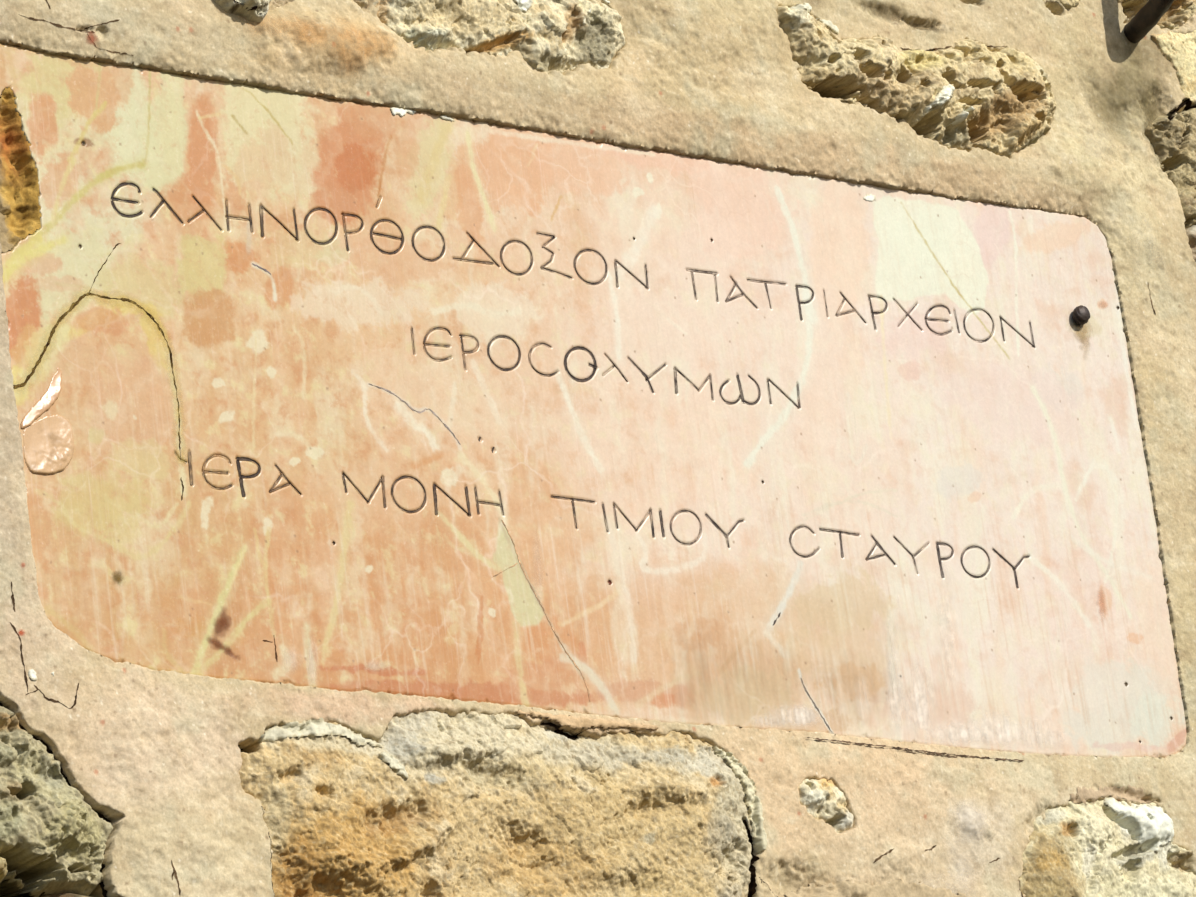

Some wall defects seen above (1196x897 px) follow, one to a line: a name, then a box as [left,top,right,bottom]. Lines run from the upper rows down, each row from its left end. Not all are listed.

crack [13,243,184,499]
crack [370,384,461,445]
crack [493,520,644,739]
crack [0,582,79,786]
peeling [1069,785,1174,853]
crack [99,853,108,897]
crack [743,820,778,897]